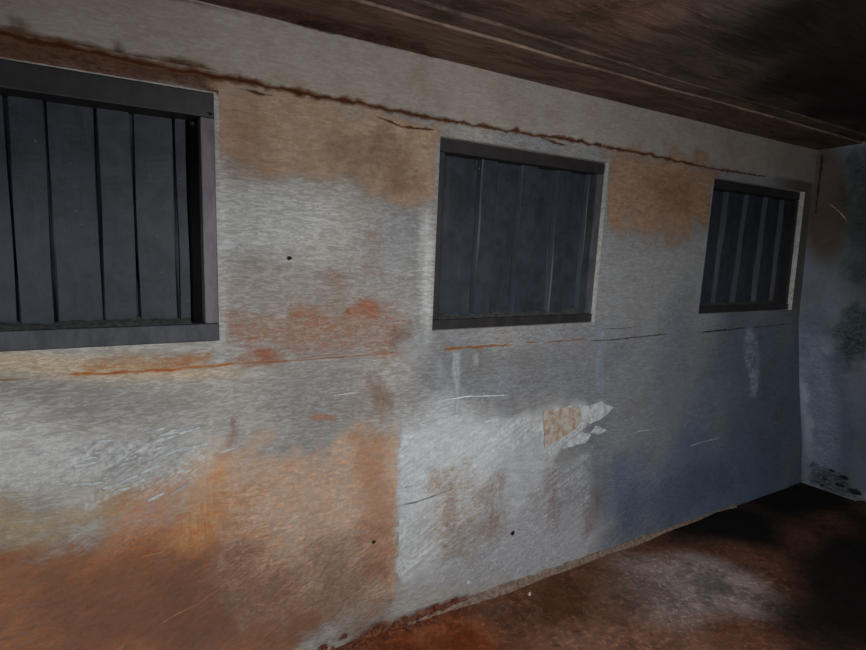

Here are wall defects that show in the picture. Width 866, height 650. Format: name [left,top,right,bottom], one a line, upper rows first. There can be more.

crack [0,29,766,177]
corrosion [0,466,331,650]
peeling [396,401,614,590]